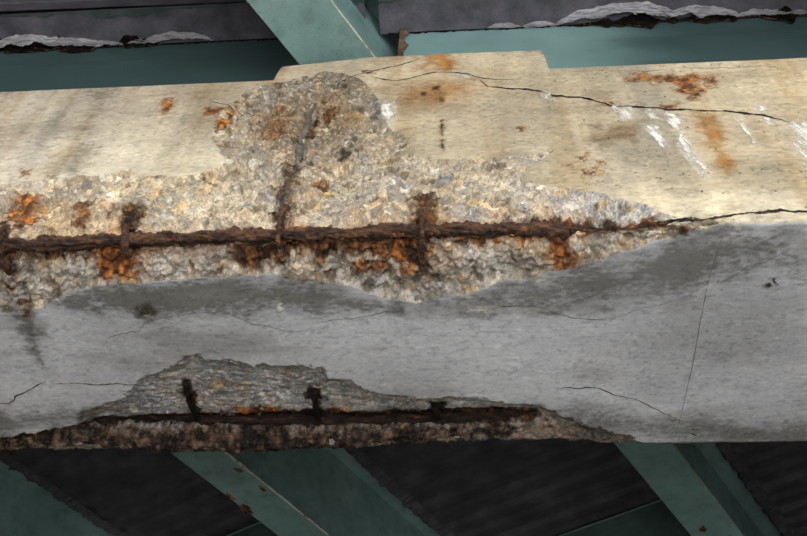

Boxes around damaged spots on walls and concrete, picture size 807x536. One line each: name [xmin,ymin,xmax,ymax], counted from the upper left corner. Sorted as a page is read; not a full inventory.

crack [331,59,791,123]
corrosion [628,72,716,100]
damp [591,105,635,141]
damp [647,110,706,172]
damp [789,122,807,158]
spalling [0,71,718,314]
crack [649,208,807,225]
corrosion [200,232,532,276]
corrosion [530,216,690,270]
crack [0,382,144,404]
spalling [0,354,642,450]
corrosion [0,404,555,454]